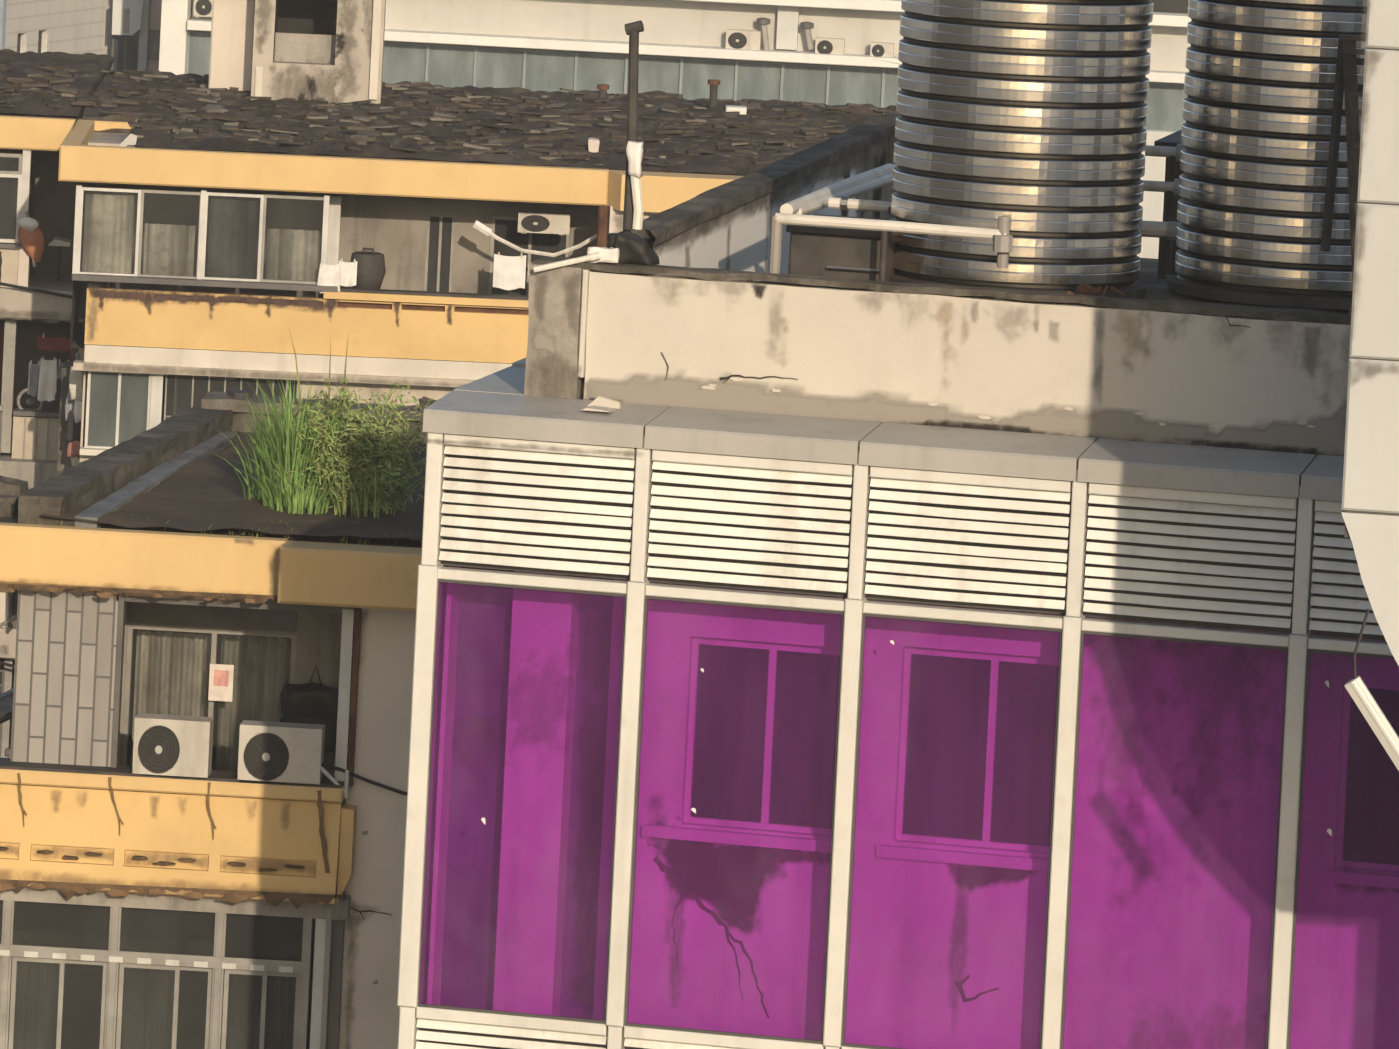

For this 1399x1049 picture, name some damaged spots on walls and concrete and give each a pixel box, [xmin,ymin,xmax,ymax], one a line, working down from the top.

damp [298,79,322,102]
peeling [91,287,337,317]
damp [925,421,1030,433]
damp [1192,440,1317,457]
damp [662,839,831,932]
crack [653,856,769,1018]
crack [955,975,999,1002]